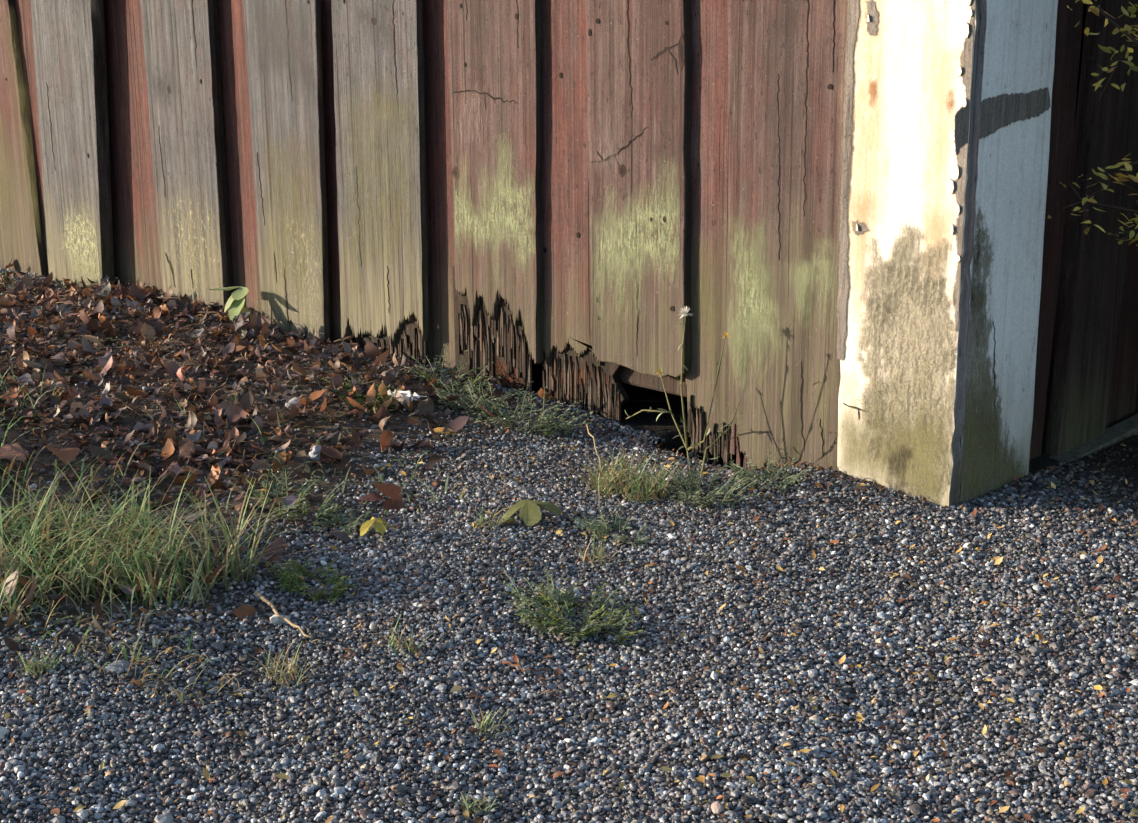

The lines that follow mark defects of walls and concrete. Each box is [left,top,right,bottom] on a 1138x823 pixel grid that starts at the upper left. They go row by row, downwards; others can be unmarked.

crack [452,90,516,109]
crack [591,0,684,172]
peeling [836,0,1050,503]